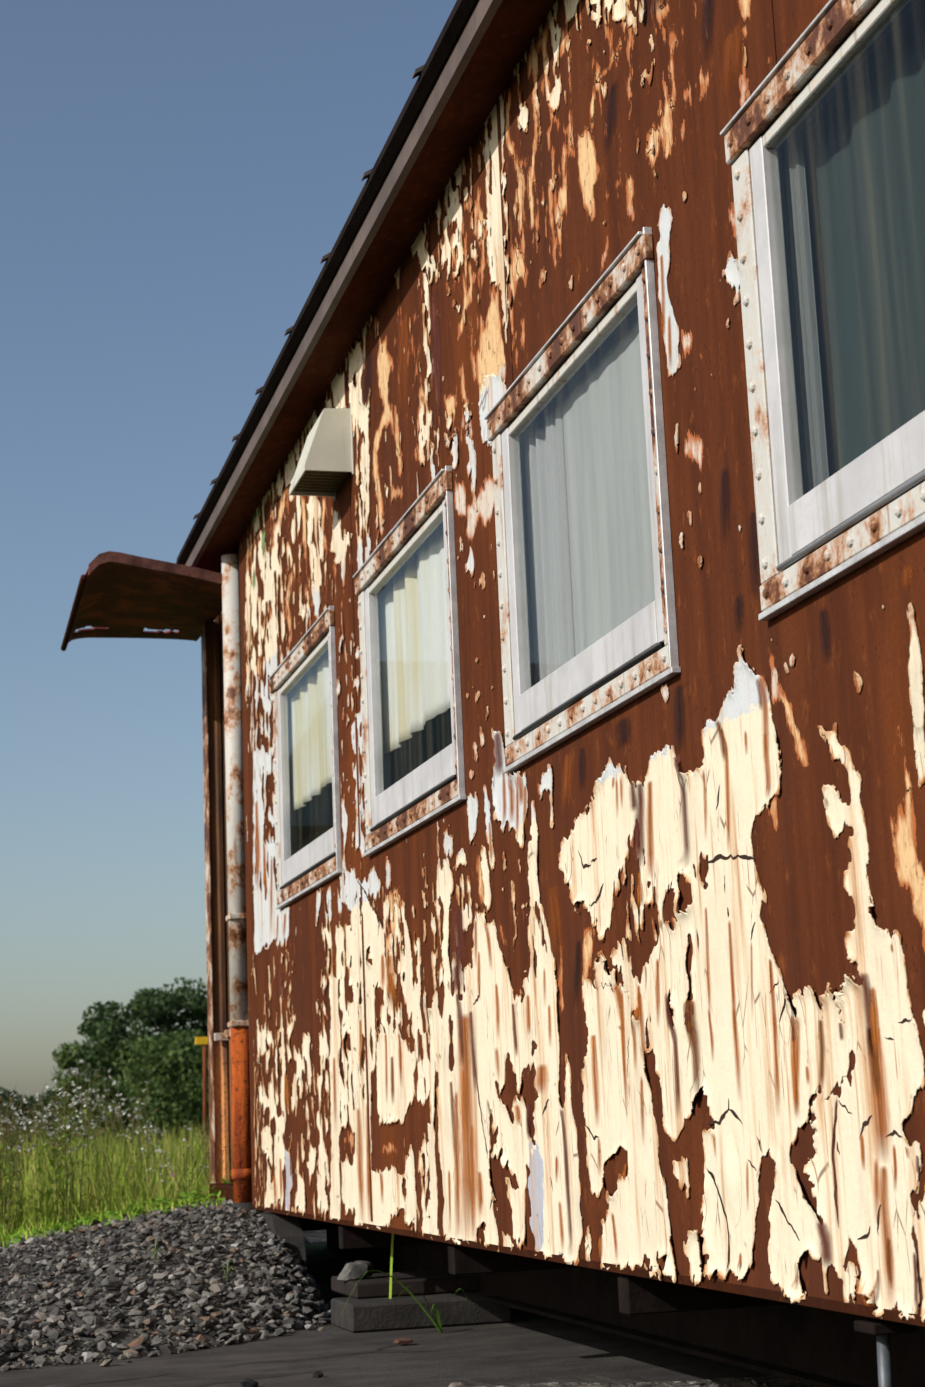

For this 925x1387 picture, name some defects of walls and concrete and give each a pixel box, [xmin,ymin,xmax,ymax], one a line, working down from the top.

peeling [245,0,925,1323]
crack [578,852,603,906]
rust [612,778,653,902]
rust [716,722,729,835]
crack [707,854,756,863]
rust [448,910,545,1220]
rust [613,908,713,1124]
rust [728,922,739,1073]
rust [769,961,823,1106]
rust [555,1110,571,1241]
rust [817,1223,831,1263]
rust [860,974,919,1307]